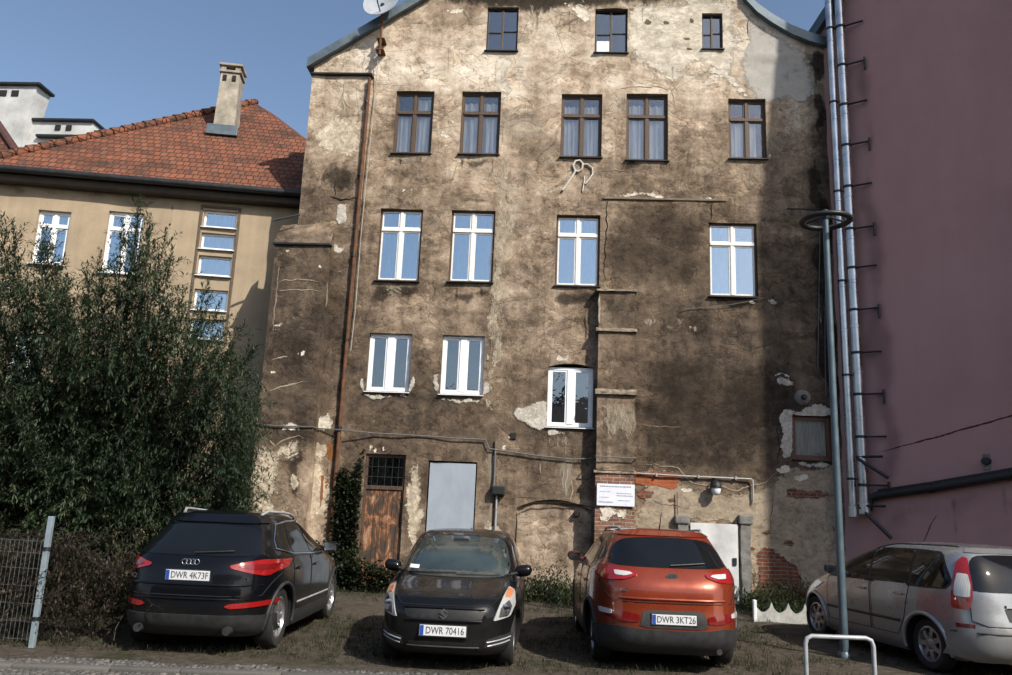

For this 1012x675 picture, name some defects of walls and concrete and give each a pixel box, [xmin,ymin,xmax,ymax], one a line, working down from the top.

spalling [251,422,303,517]
peeling [405,464,425,550]
spalling [599,461,837,608]